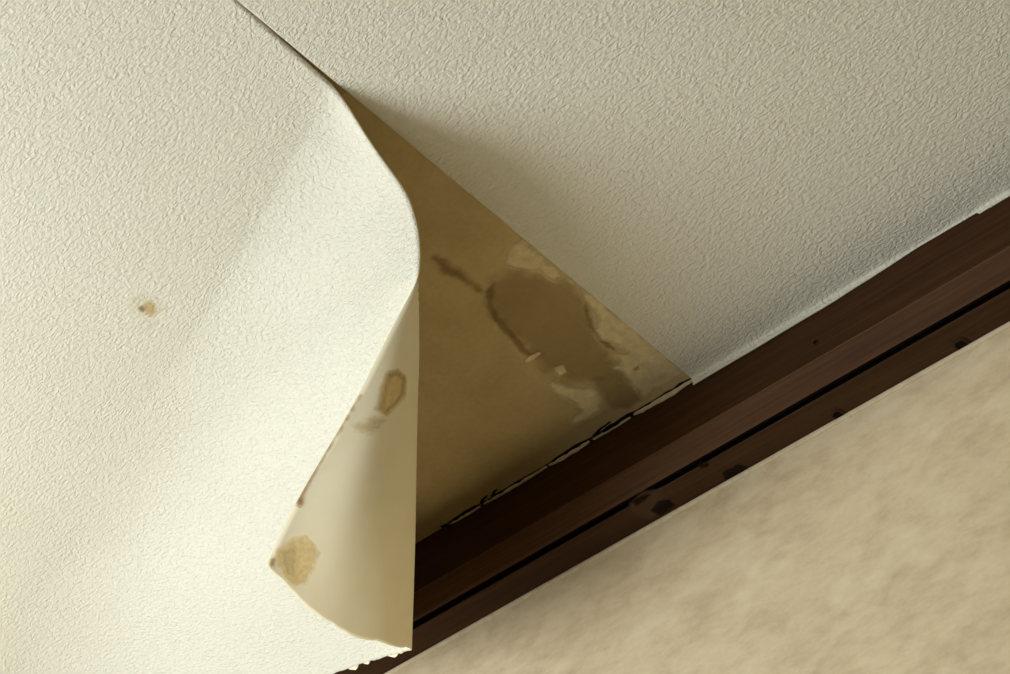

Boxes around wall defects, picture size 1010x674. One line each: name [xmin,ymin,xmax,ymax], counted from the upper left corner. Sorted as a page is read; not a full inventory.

spalling [631,488,674,519]